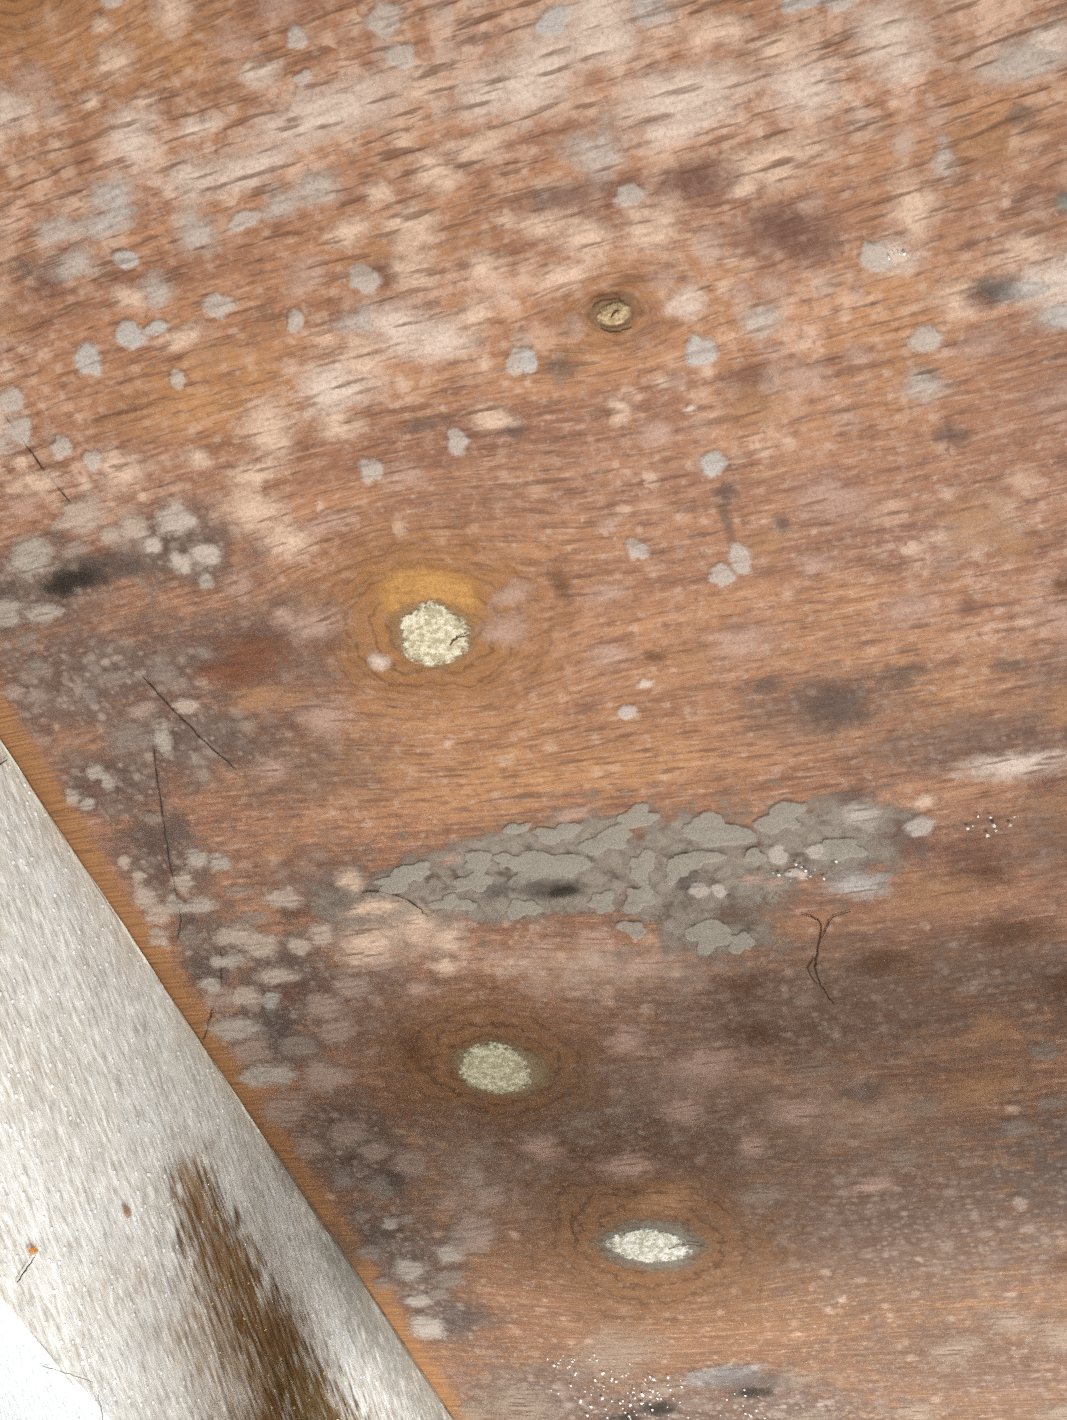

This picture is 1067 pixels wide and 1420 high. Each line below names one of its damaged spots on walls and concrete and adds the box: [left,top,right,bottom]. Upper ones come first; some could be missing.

water stain [463,0,653,113]
water stain [690,16,829,106]
water stain [635,73,726,145]
water stain [170,70,375,247]
water stain [721,136,823,197]
water stain [385,208,434,289]
water stain [520,205,609,291]
water stain [614,184,675,250]
water stain [860,186,937,272]
water stain [112,280,213,360]
water stain [300,301,491,438]
water stain [0,388,934,1340]